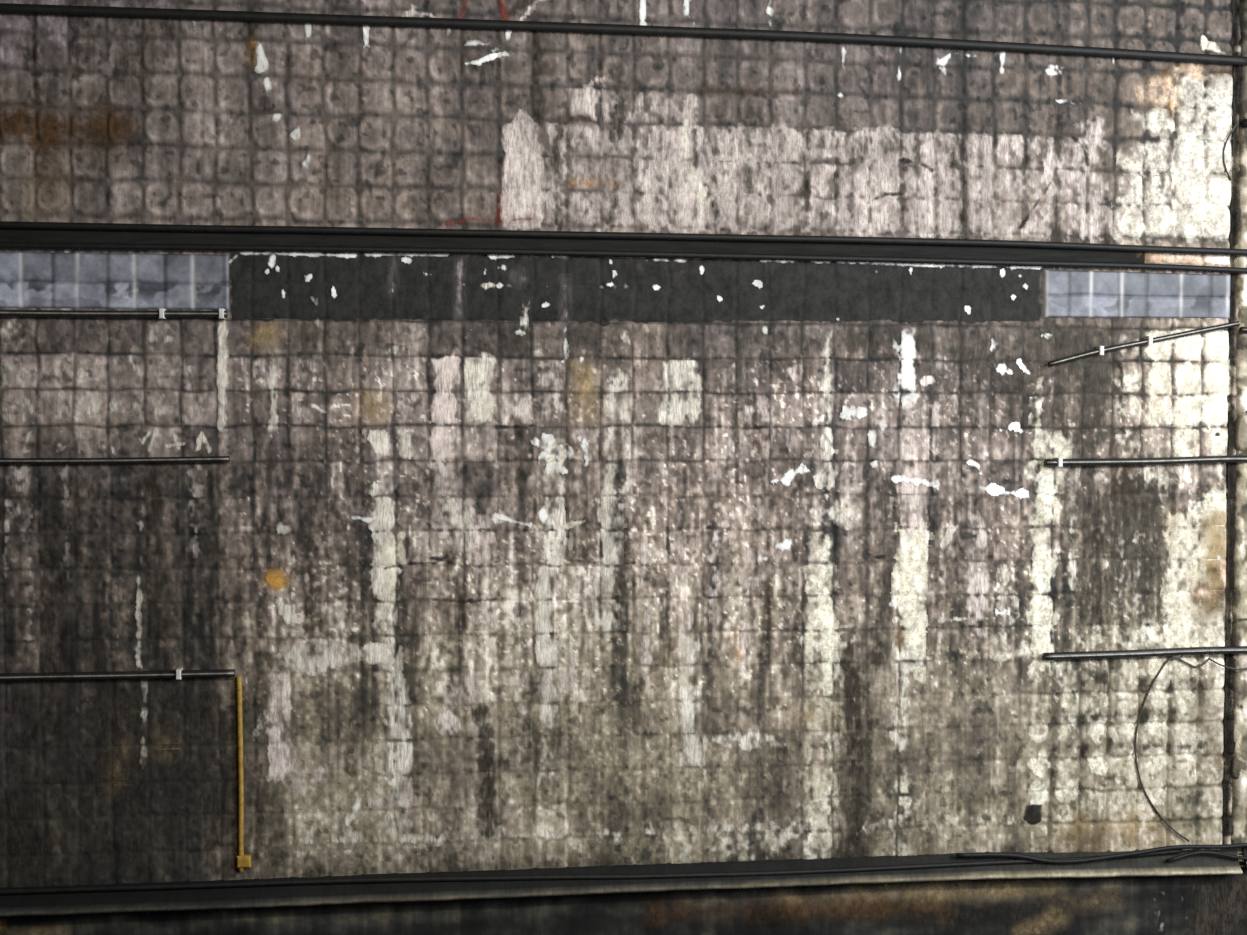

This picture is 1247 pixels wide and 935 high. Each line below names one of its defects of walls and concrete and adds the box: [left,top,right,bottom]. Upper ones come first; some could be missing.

corrosion [0,111,120,177]
peeling [498,64,1240,243]
peeling [229,251,449,274]
peeling [489,254,514,288]
peeling [814,261,1042,300]
leakage [658,360,701,426]
leakage [364,353,530,844]
leakage [514,449,571,727]
leakage [582,372,635,638]
leakage [789,332,940,859]
leakage [967,329,1234,686]
leakage [678,611,706,778]